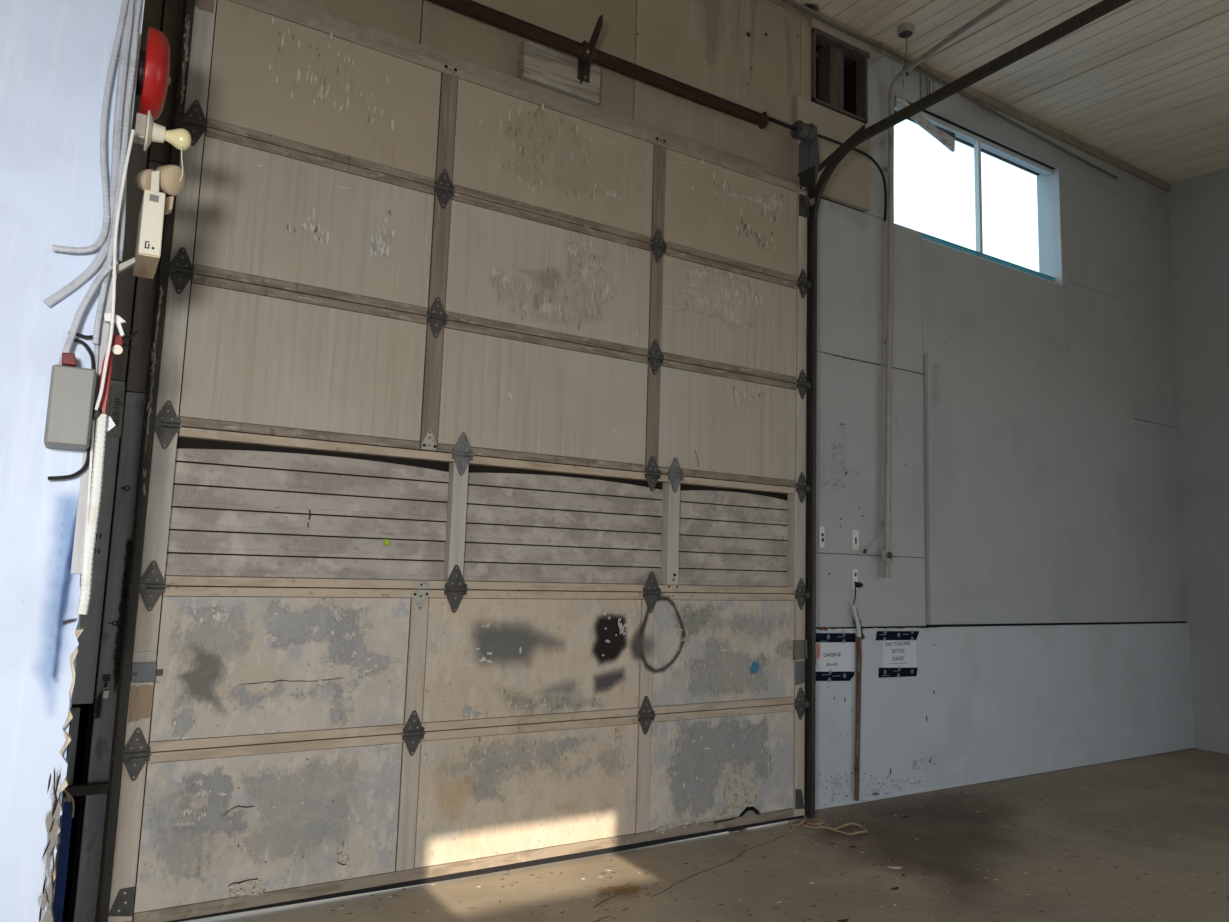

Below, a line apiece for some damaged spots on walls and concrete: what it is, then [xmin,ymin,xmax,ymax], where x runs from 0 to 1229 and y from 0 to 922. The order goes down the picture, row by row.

peeling [269,18,394,131]
peeling [264,598,390,722]
spalling [39,706,89,922]
peeling [175,769,247,841]
peeling [670,718,774,823]
spalling [229,881,267,897]